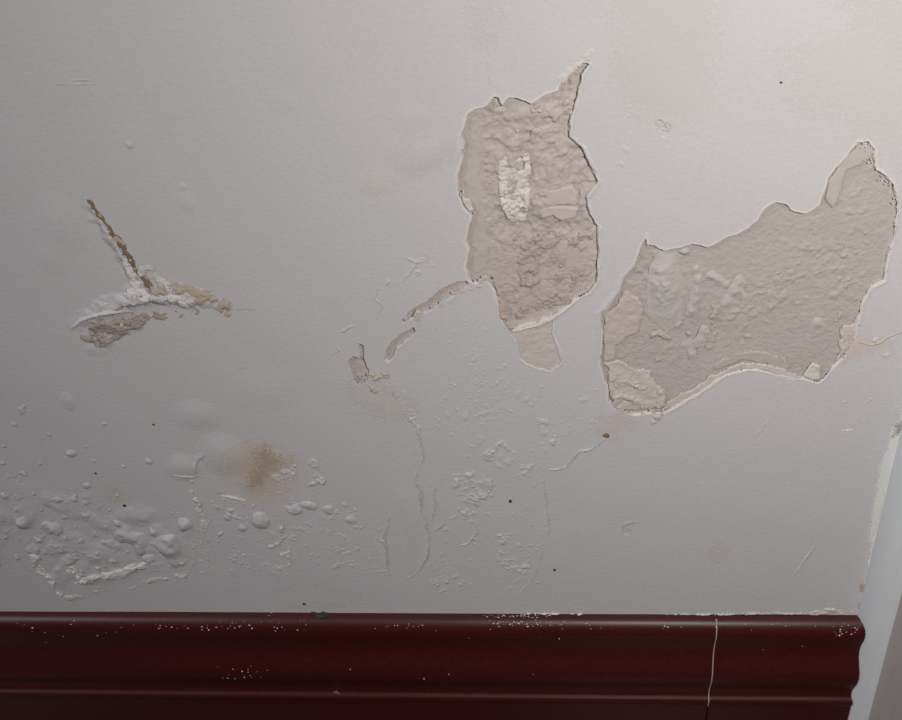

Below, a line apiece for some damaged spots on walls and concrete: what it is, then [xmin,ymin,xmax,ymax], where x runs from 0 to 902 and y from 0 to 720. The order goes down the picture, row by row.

peeling [344,341,371,387]
flaking render [382,61,602,374]
flaking render [593,139,901,417]